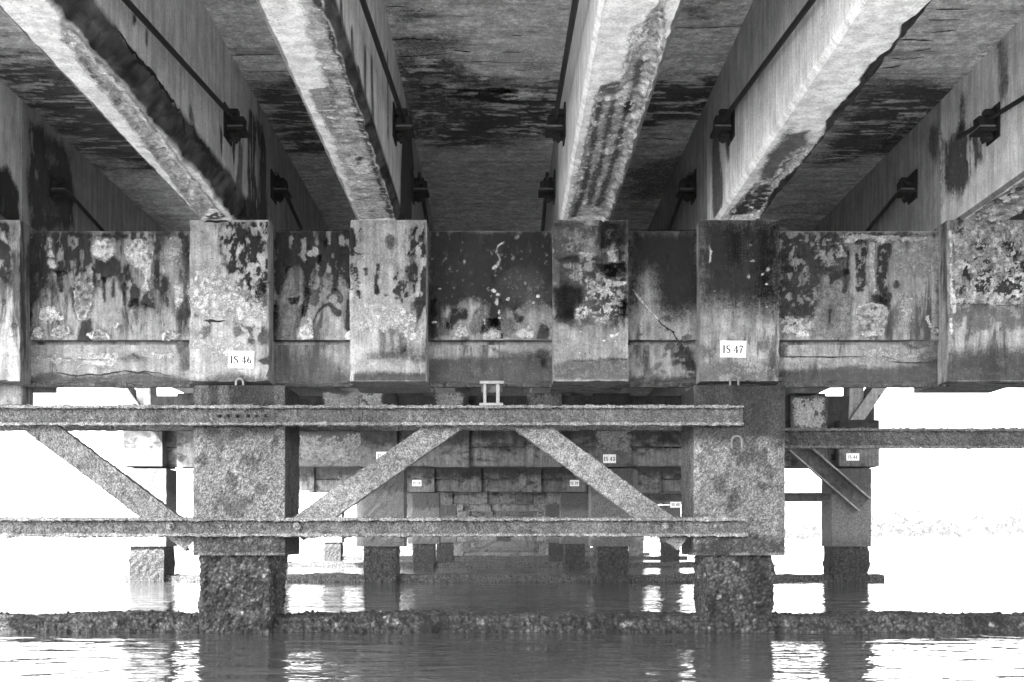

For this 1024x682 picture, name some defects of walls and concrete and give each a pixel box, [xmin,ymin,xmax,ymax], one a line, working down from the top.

damp [0,34,1024,428]
crack [656,316,686,350]
crack [43,357,176,378]